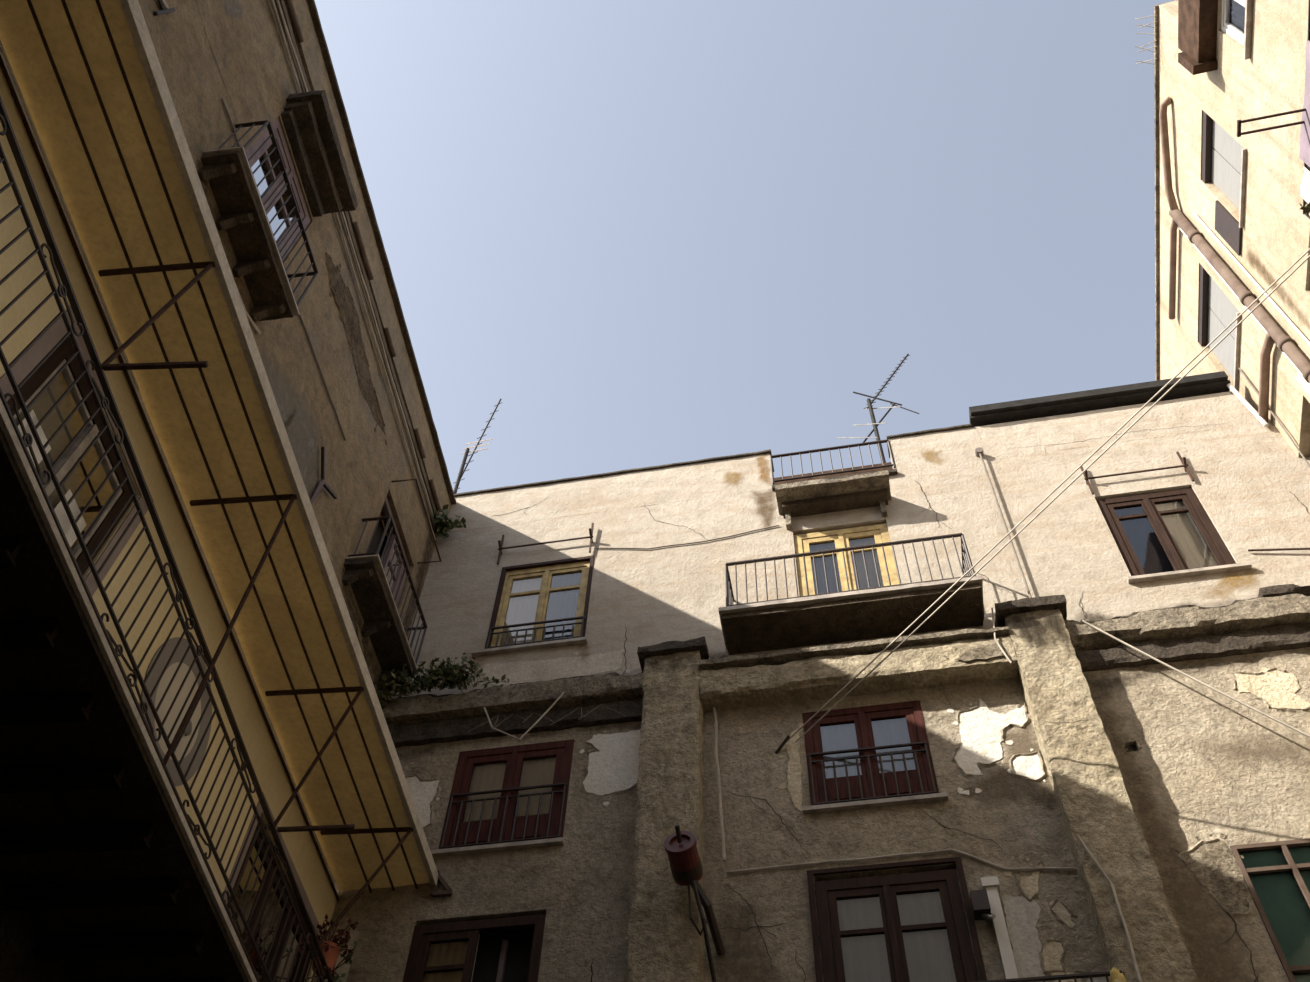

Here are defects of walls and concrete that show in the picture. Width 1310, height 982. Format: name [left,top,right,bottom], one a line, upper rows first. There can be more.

peeling [1232,667,1310,712]
peeling [405,773,442,830]
peeling [579,730,641,806]
peeling [947,699,1046,795]
spalling [1003,857,1084,982]
crack [1217,910,1258,982]